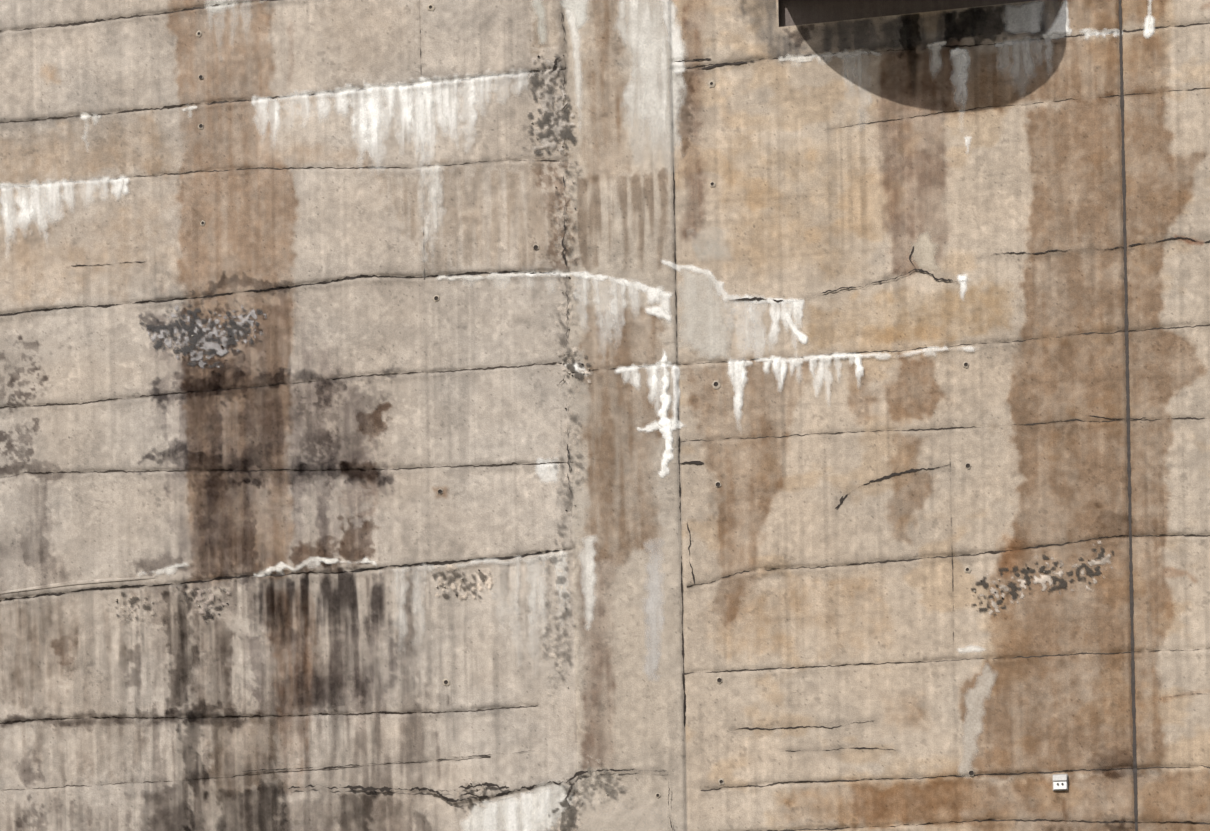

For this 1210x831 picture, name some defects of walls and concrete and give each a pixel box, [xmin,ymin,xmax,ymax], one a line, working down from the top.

leakage [301,76,491,153]
leakage [1,181,72,228]
leakage [105,177,128,195]
crack [735,246,968,302]
leakage [912,233,938,270]
crack [990,237,1210,256]
spalling [140,306,266,368]
leakage [553,261,888,416]
leakage [616,352,683,477]
crack [835,464,950,509]
leakage [255,548,383,616]
spalling [971,548,1114,615]